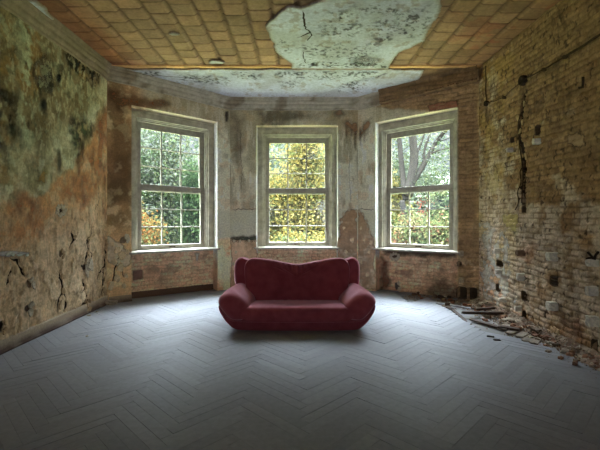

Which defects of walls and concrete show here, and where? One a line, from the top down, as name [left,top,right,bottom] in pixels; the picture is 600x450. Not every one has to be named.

damp [65,53,100,84]
peeling [127,0,442,97]
crack [298,12,312,63]
damp [260,111,304,123]
flaking render [428,101,458,111]
damp [69,117,105,188]
crack [6,257,28,285]
crack [56,273,67,311]
crack [69,186,124,300]
peeling [337,208,377,289]